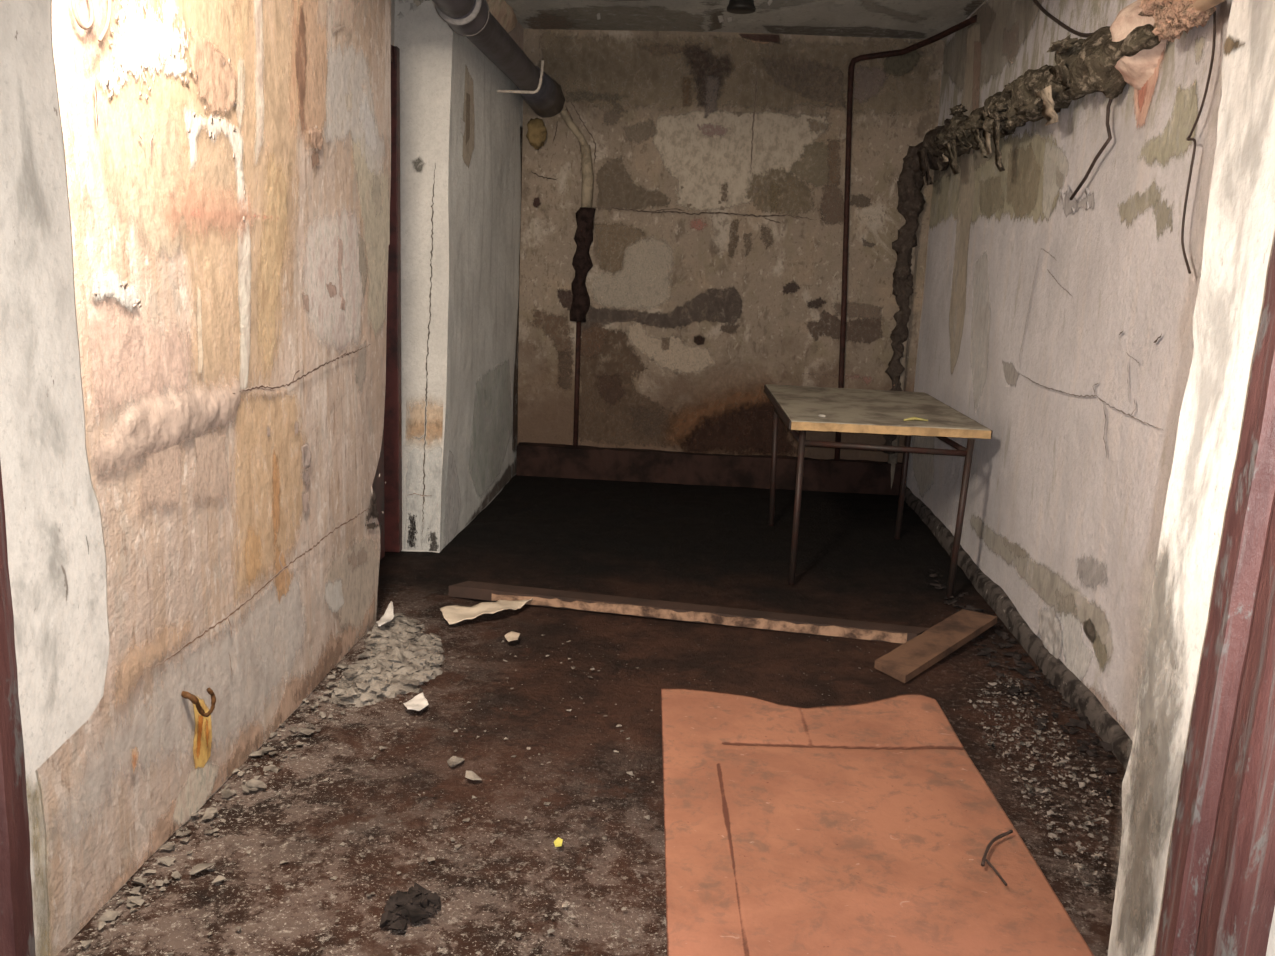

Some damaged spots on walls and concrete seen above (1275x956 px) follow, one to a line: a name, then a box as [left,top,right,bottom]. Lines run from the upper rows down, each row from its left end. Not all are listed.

peeling [98,0,248,223]
water stain [523,0,1042,143]
peeling [93,271,142,311]
crack [233,344,371,394]
crack [408,164,436,550]
water stain [469,287,742,522]
water stain [929,131,1068,407]
crack [1018,248,1163,457]
water stain [1118,182,1173,238]
crack [154,508,369,680]
water stain [970,516,1112,665]
rust [193,696,212,769]